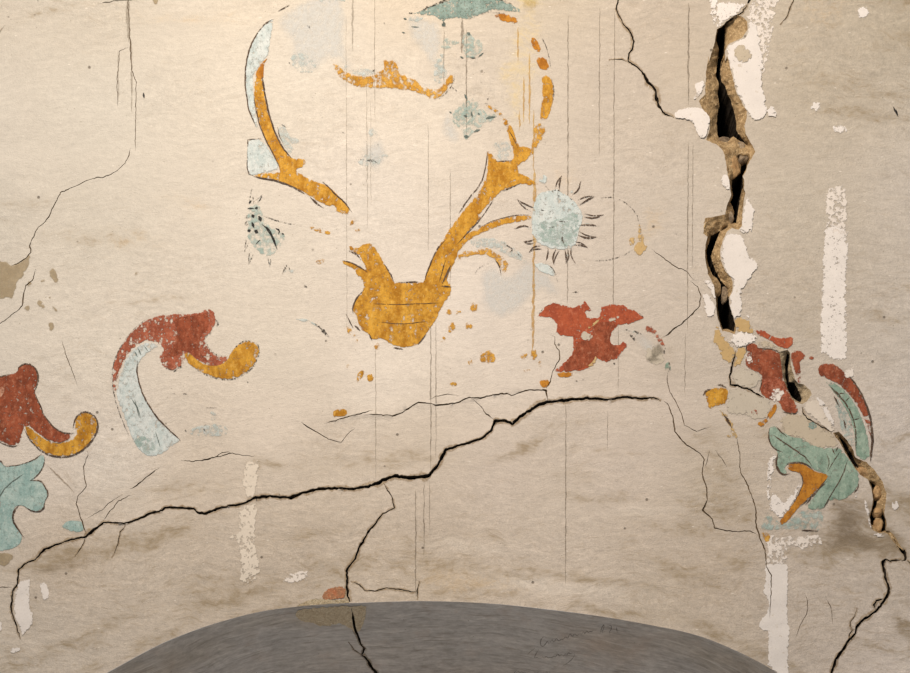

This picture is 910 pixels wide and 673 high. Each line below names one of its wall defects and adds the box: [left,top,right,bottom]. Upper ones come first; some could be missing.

crack [0,0,137,324]
crack [652,0,764,398]
peeling [703,294,715,316]
peeling [713,317,757,366]
crack [0,336,772,673]
crack [779,350,910,673]